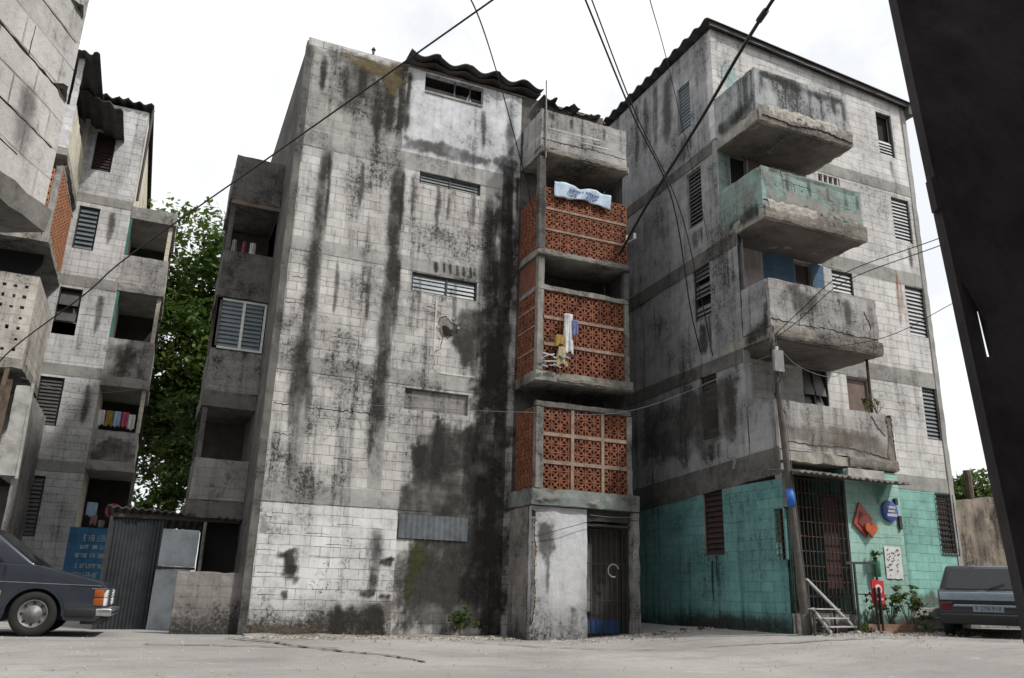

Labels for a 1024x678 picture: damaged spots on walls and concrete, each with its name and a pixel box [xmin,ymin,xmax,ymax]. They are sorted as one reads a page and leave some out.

leakage [343,67,412,131]
mould [760,70,846,120]
spalling [758,103,854,147]
spalling [763,169,868,241]
leakage [290,154,331,405]
spalling [436,316,460,339]
crack [771,312,876,339]
leakage [360,168,525,635]
crack [789,436,889,459]
leakage [278,548,298,581]